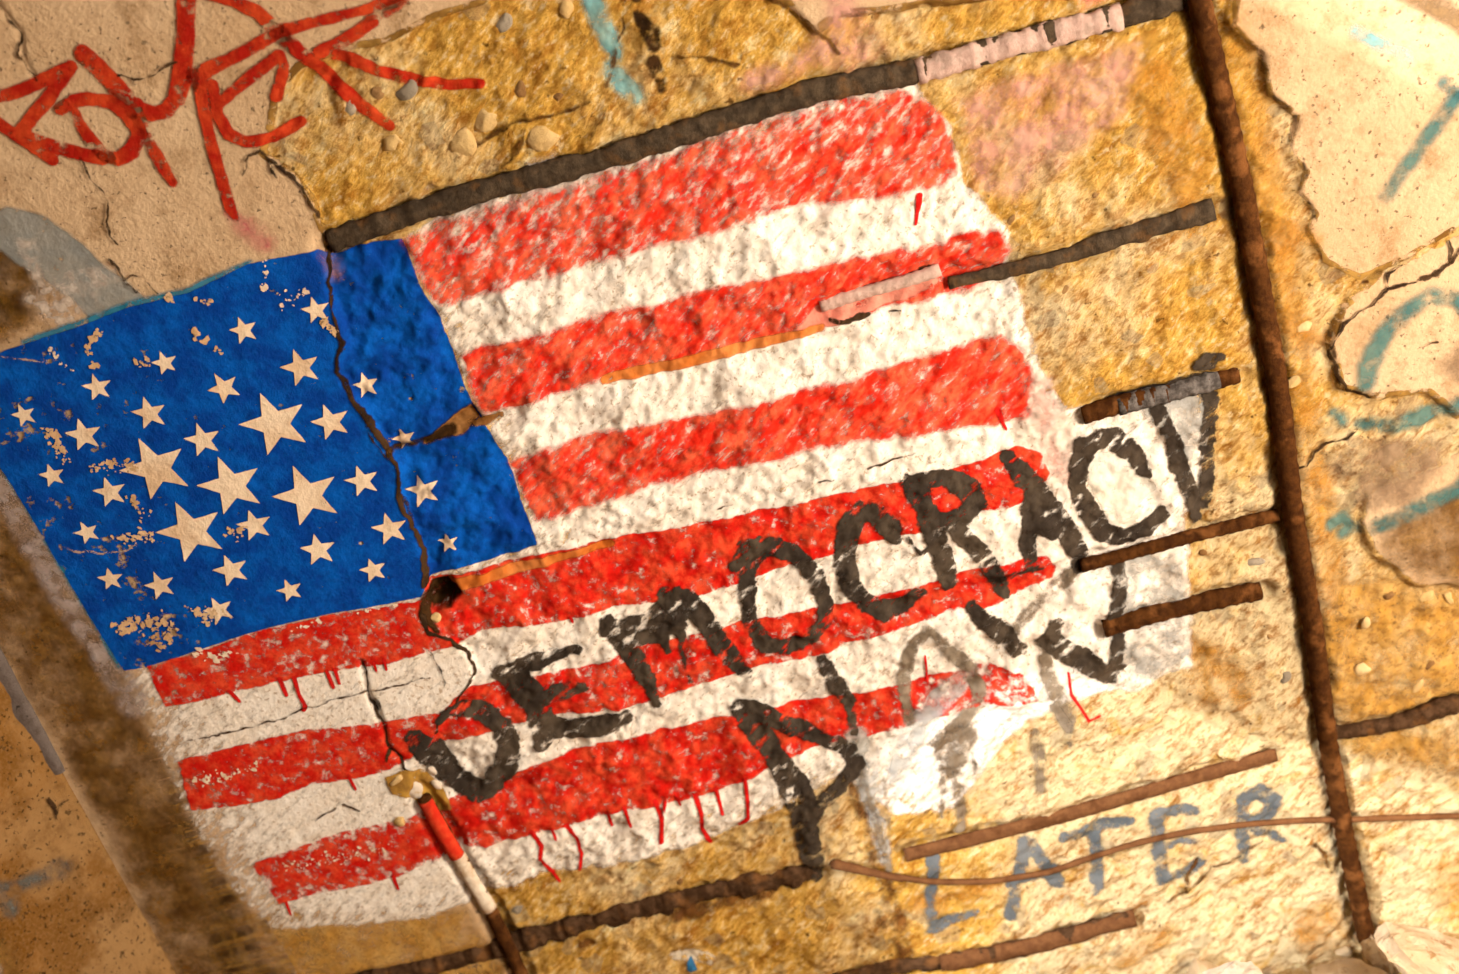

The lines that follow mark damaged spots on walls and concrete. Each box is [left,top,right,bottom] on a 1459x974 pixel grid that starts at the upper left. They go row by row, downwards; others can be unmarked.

crack [1,9,37,81]
corrosion [1174,167,1202,208]
crack [81,159,159,294]
spalling [258,0,1128,634]
crack [187,149,477,771]
spalling [474,0,1459,974]
crack [316,804,360,821]
spalling [385,757,451,811]
peeling [283,842,389,871]
corrosion [849,781,988,959]
corrosion [670,890,775,923]
corrosion [578,938,596,950]